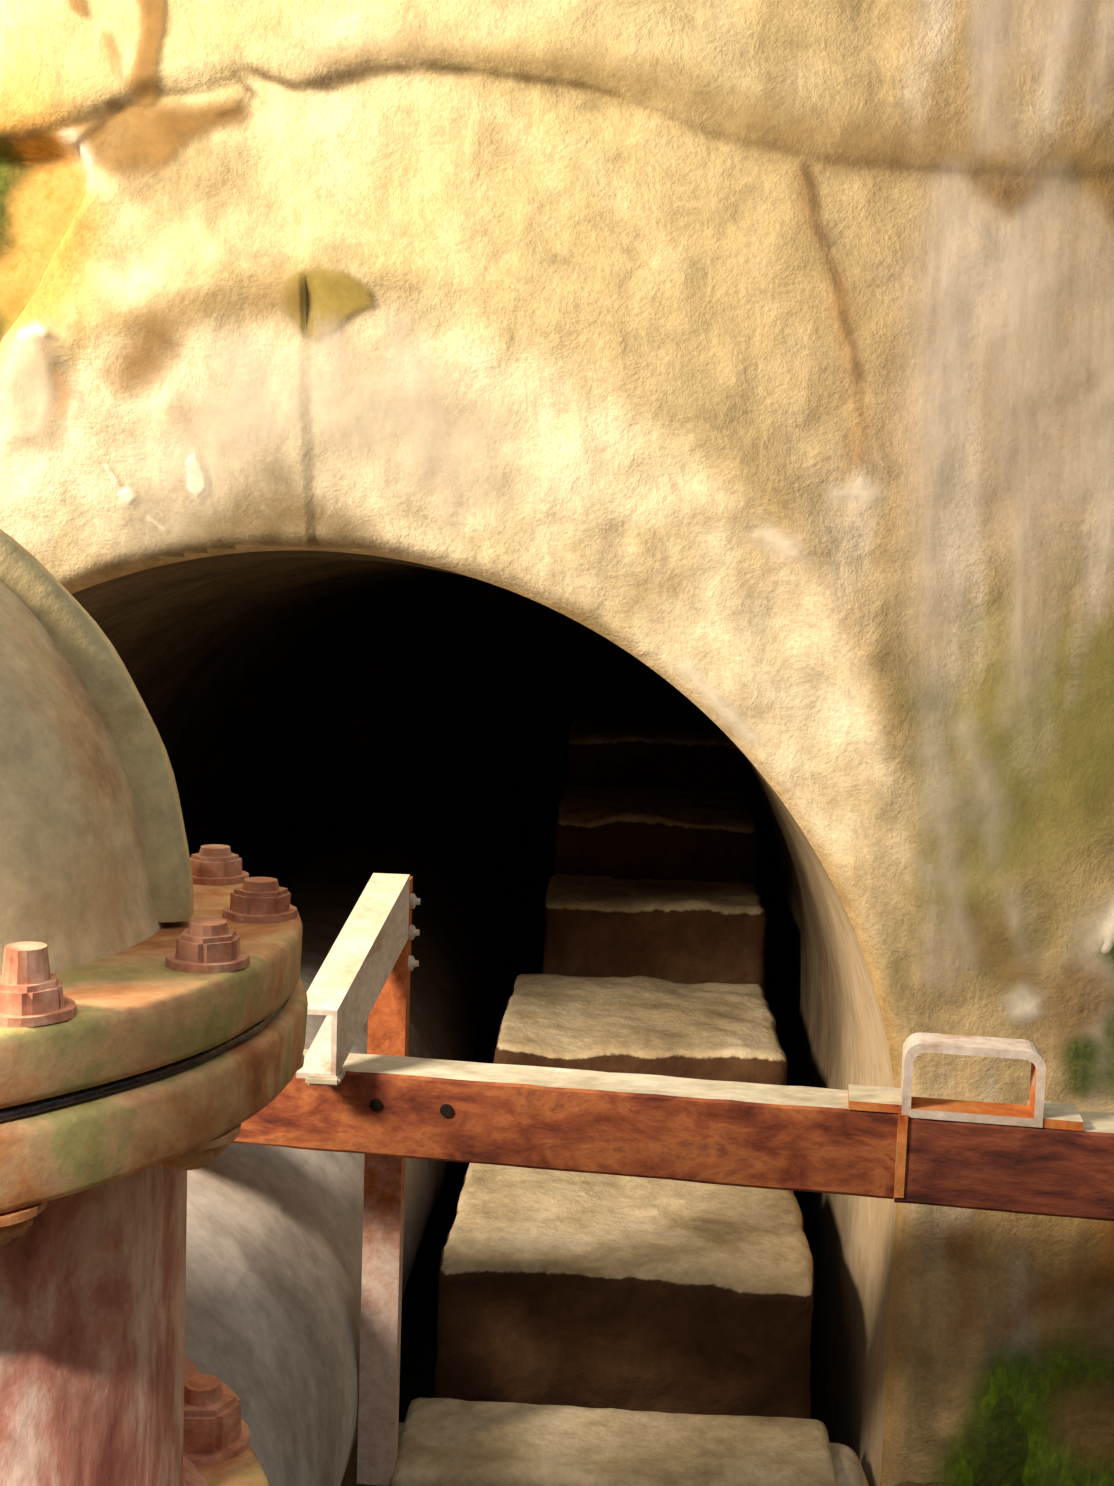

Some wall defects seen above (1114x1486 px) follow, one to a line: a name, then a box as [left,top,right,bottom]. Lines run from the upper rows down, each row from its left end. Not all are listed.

leakage [69,0,85,14]
leakage [85,0,240,168]
leakage [285,270,371,340]